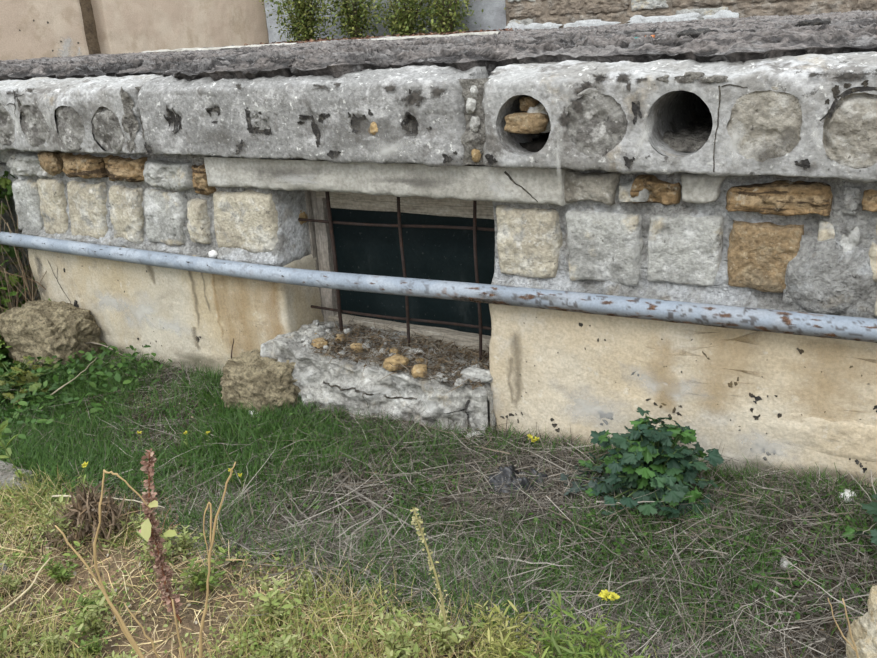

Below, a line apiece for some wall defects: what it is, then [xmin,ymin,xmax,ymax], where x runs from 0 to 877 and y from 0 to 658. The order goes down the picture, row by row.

spalling [163,105,182,134]
spalling [235,107,272,155]
spalling [297,113,330,148]
spalling [348,109,378,135]
spalling [400,89,432,135]
crack [713,84,748,172]
crack [504,171,538,202]
crack [323,381,417,406]
crack [444,400,470,431]